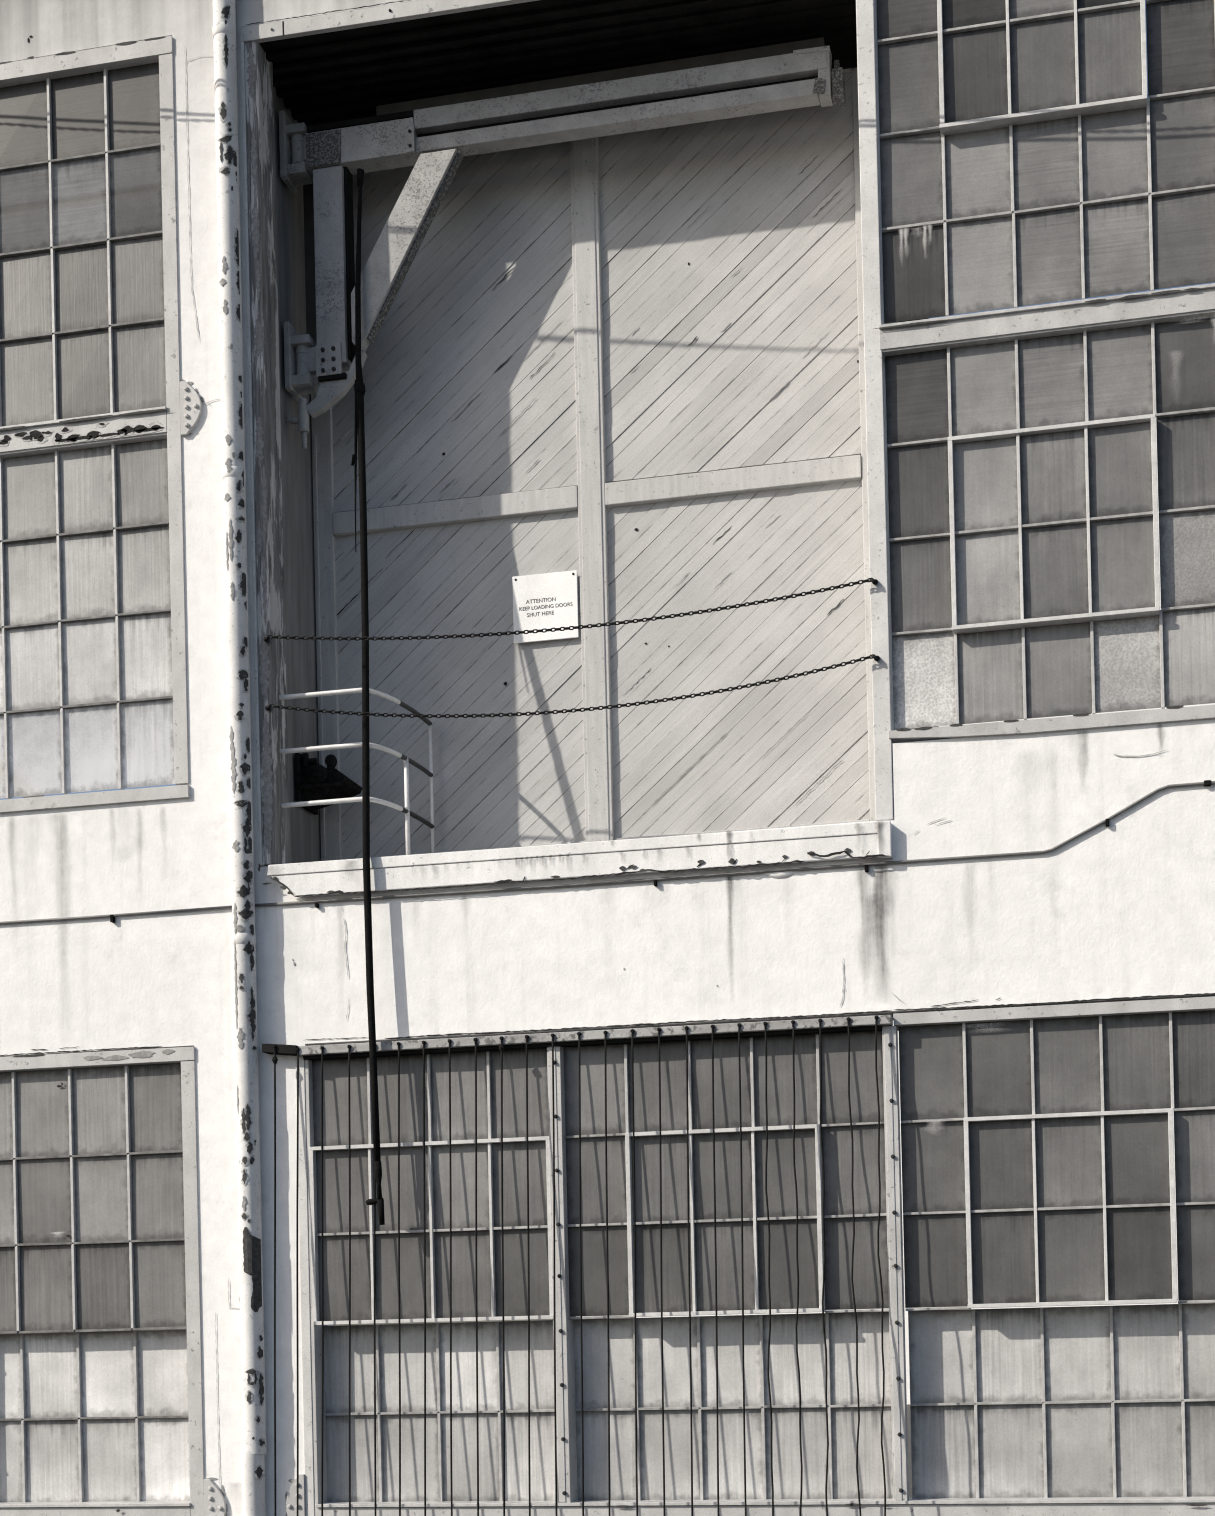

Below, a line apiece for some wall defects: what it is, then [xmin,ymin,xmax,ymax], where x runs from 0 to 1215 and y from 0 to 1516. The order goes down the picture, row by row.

peeling [221,5,232,69]
peeling [217,101,263,356]
peeling [0,408,171,447]
peeling [237,1086,262,1312]